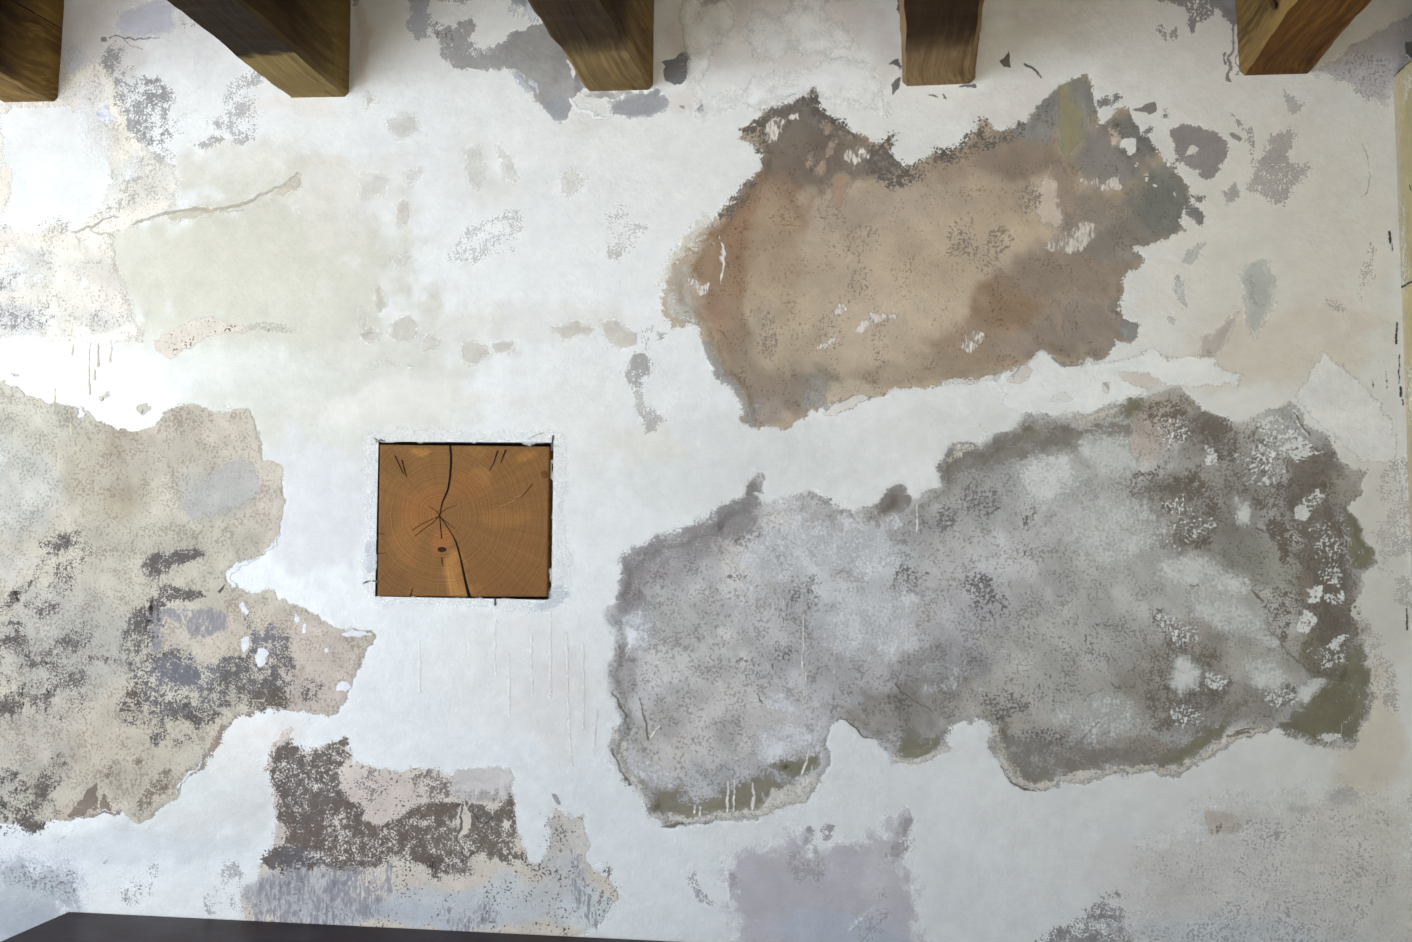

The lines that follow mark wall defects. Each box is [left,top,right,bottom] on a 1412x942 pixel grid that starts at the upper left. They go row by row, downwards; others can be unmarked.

peeling [406,0,704,124]
crack [71,172,300,242]
damp [657,215,715,289]
spalling [0,373,376,836]
peeling [240,736,621,937]